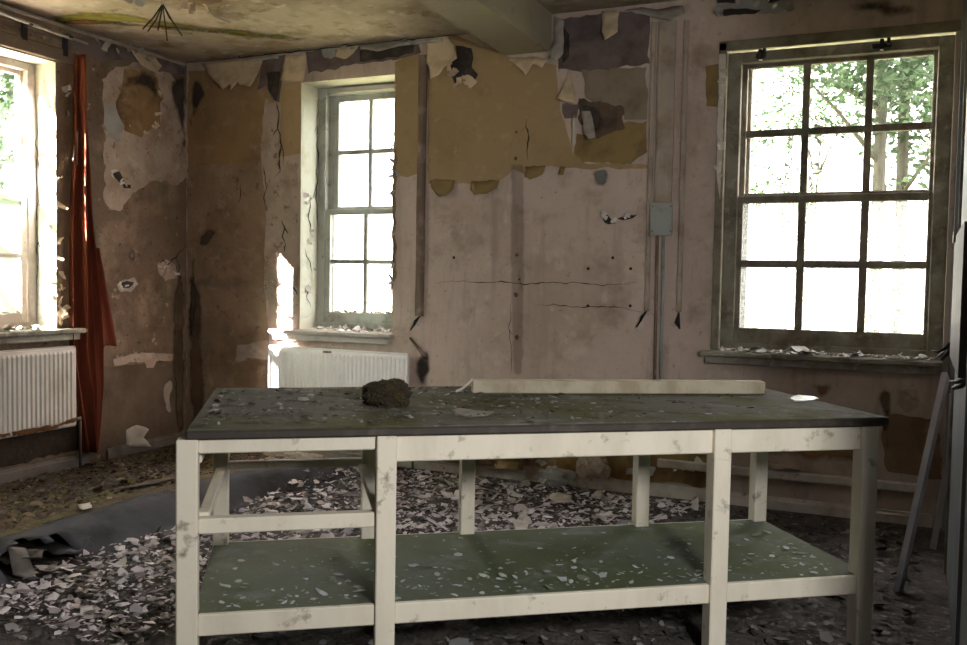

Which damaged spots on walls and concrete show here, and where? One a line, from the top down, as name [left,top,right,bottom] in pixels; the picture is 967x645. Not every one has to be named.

peeling [67,33,187,211]
crack [239,103,288,252]
peeling [257,55,317,330]
flaking render [443,46,478,88]
peeling [549,12,650,165]
flaking render [97,352,184,454]
flaking render [233,341,268,388]
crack [450,276,638,370]